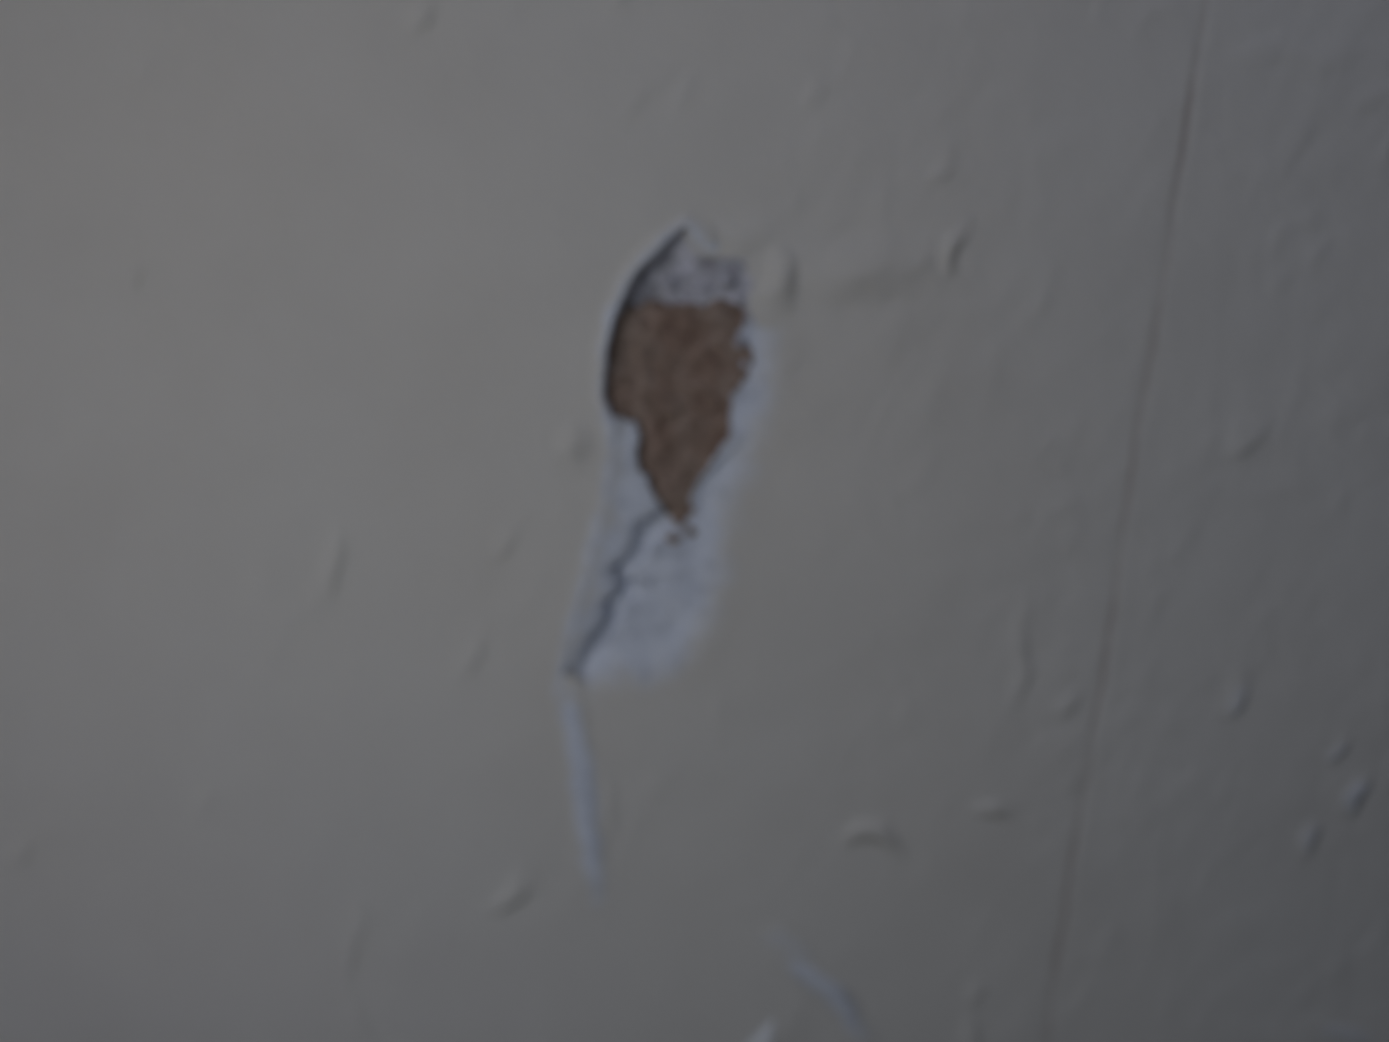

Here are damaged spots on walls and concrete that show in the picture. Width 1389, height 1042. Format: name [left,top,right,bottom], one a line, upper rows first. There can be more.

flaking render [534,195,806,732]